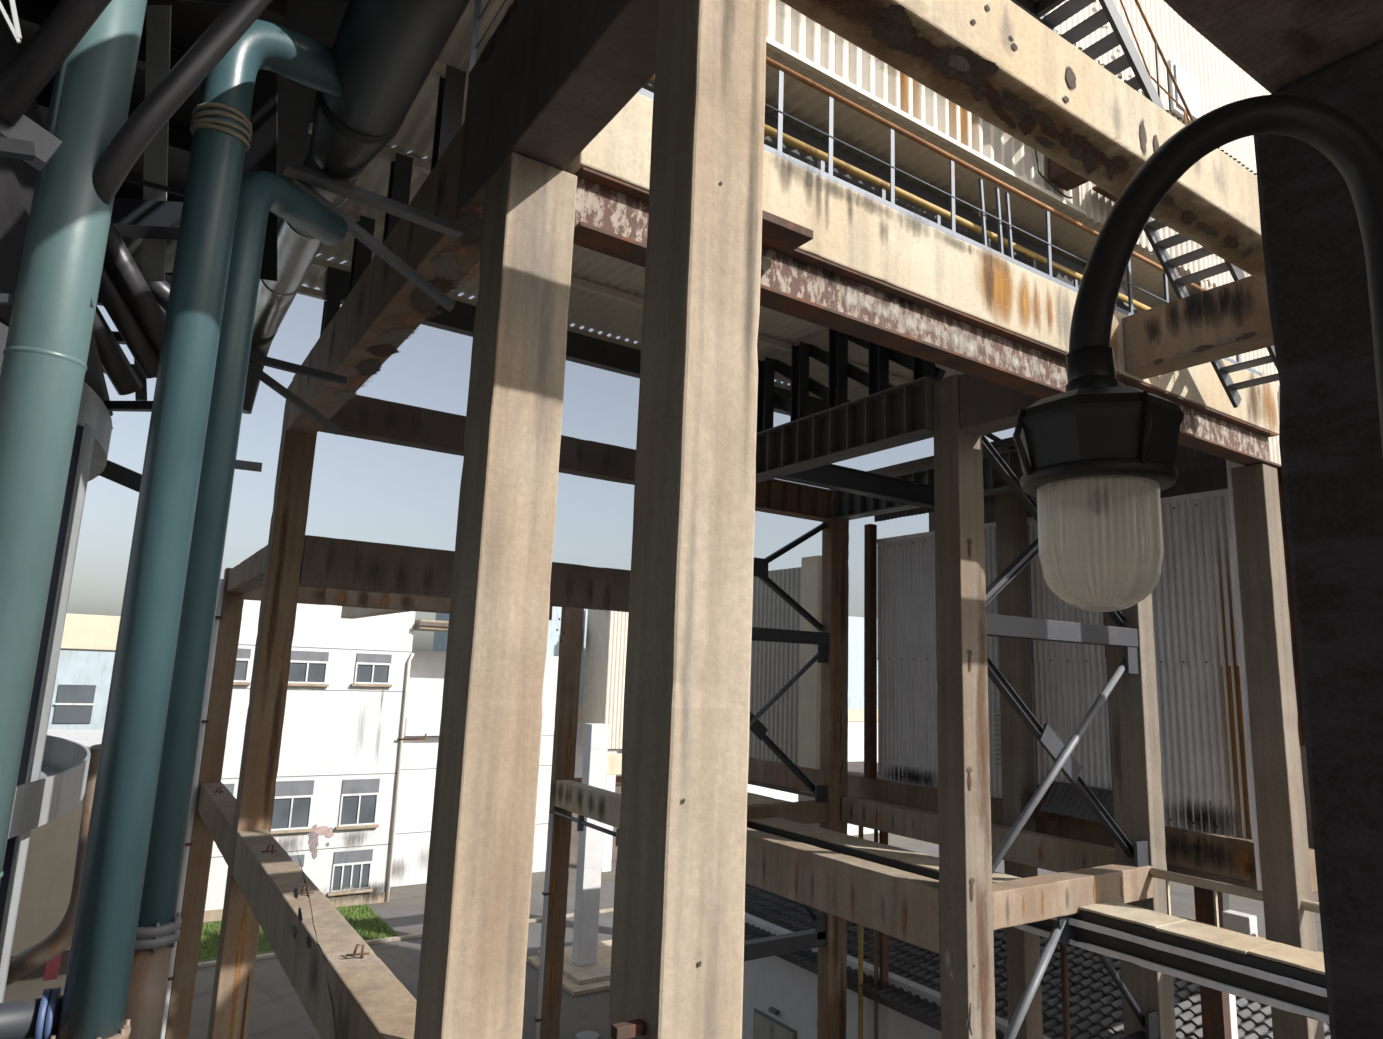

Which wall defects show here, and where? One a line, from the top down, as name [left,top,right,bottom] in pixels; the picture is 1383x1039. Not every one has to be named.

damp [797,0,890,52]
spalling [1140,120,1159,155]
rust [984,265,1052,324]
damp [1147,289,1249,338]
crack [296,849,336,1037]